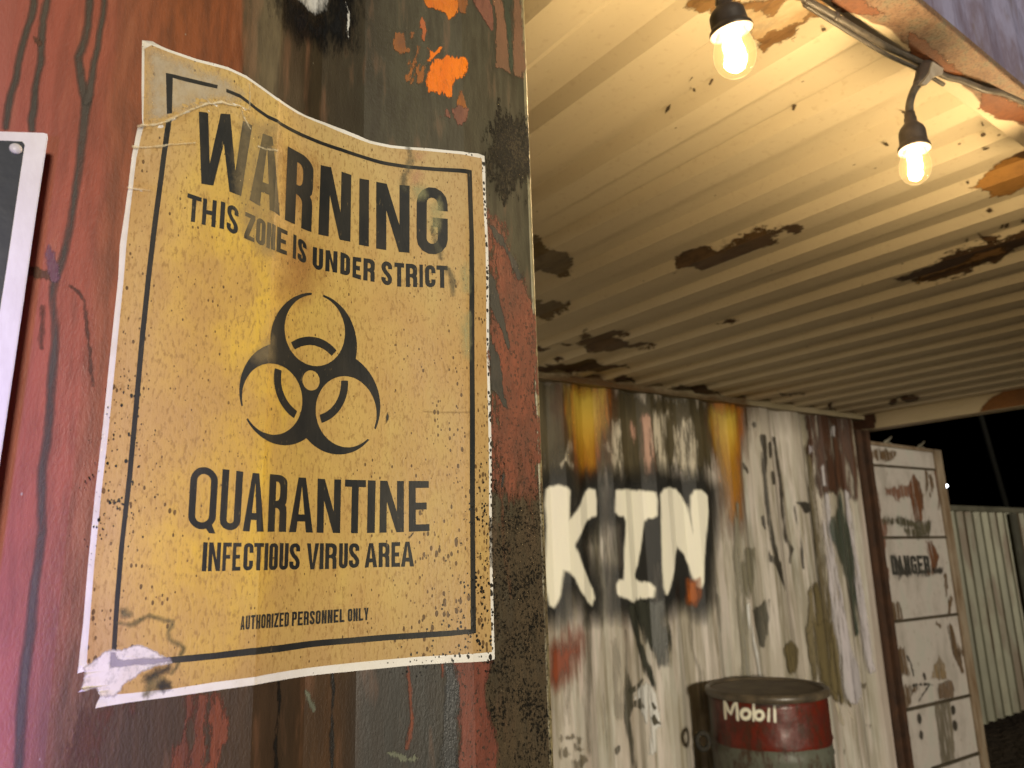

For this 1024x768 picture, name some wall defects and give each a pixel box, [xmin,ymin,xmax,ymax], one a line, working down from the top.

peeling [685,0,716,14]
peeling [732,0,883,53]
peeling [393,0,469,125]
peeling [533,235,573,278]
peeling [673,224,804,274]
rust [487,208,543,517]
peeling [537,329,656,382]
peeling [672,384,713,394]